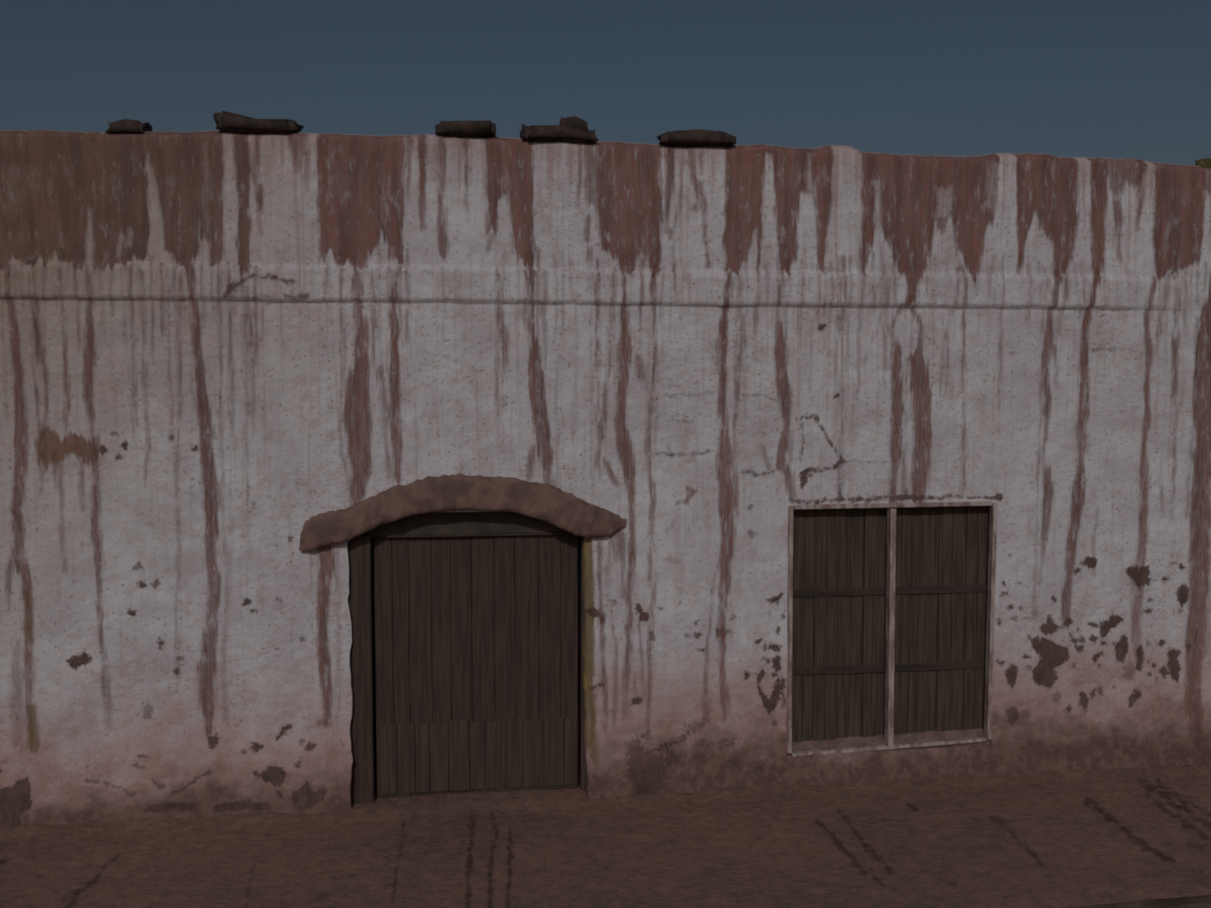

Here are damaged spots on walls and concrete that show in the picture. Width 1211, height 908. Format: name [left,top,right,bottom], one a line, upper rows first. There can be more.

rust [35,428,99,467]
spalling [1074,556,1097,573]
spalling [1126,565,1190,614]
spalling [744,593,786,714]
spalling [997,596,1191,689]
spalling [1066,689,1096,712]
spalling [1128,689,1142,707]
spalling [250,724,292,752]
spalling [214,739,326,811]
spalling [0,777,32,827]